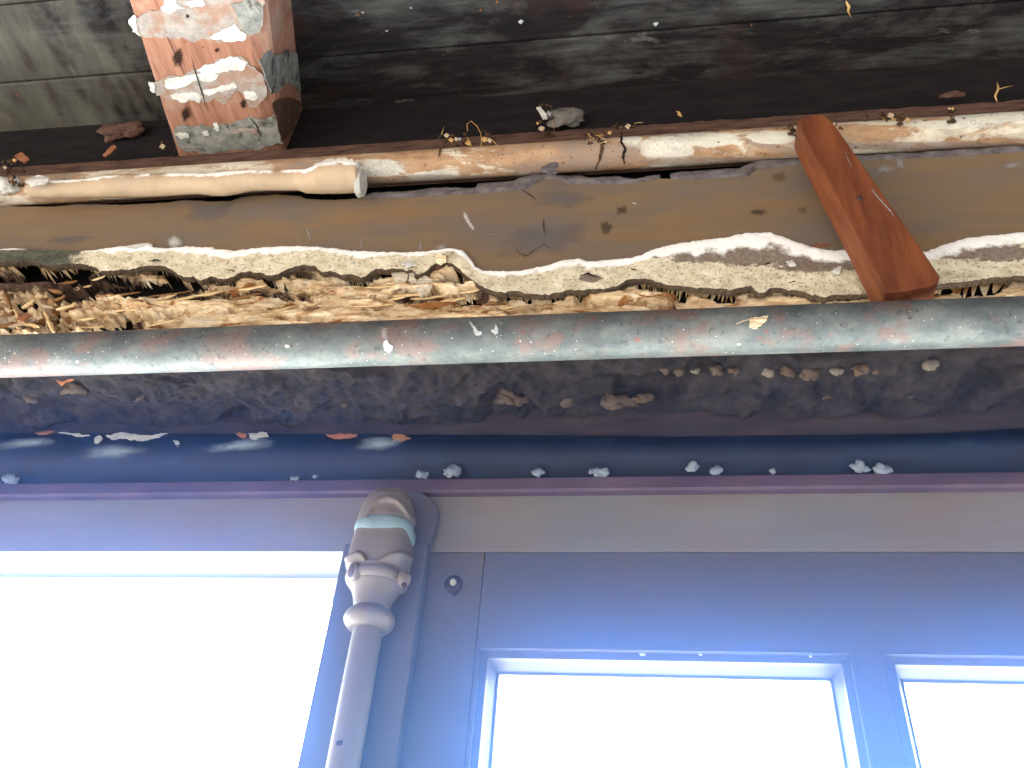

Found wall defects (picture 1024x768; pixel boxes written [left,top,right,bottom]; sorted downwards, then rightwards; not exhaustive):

peeling [128,0,265,43]
crack [191,56,209,113]
peeling [148,50,302,154]
crack [619,131,627,164]
crack [513,190,552,257]
spalling [0,232,869,303]
spalling [923,232,1024,290]
spalling [0,346,1024,445]